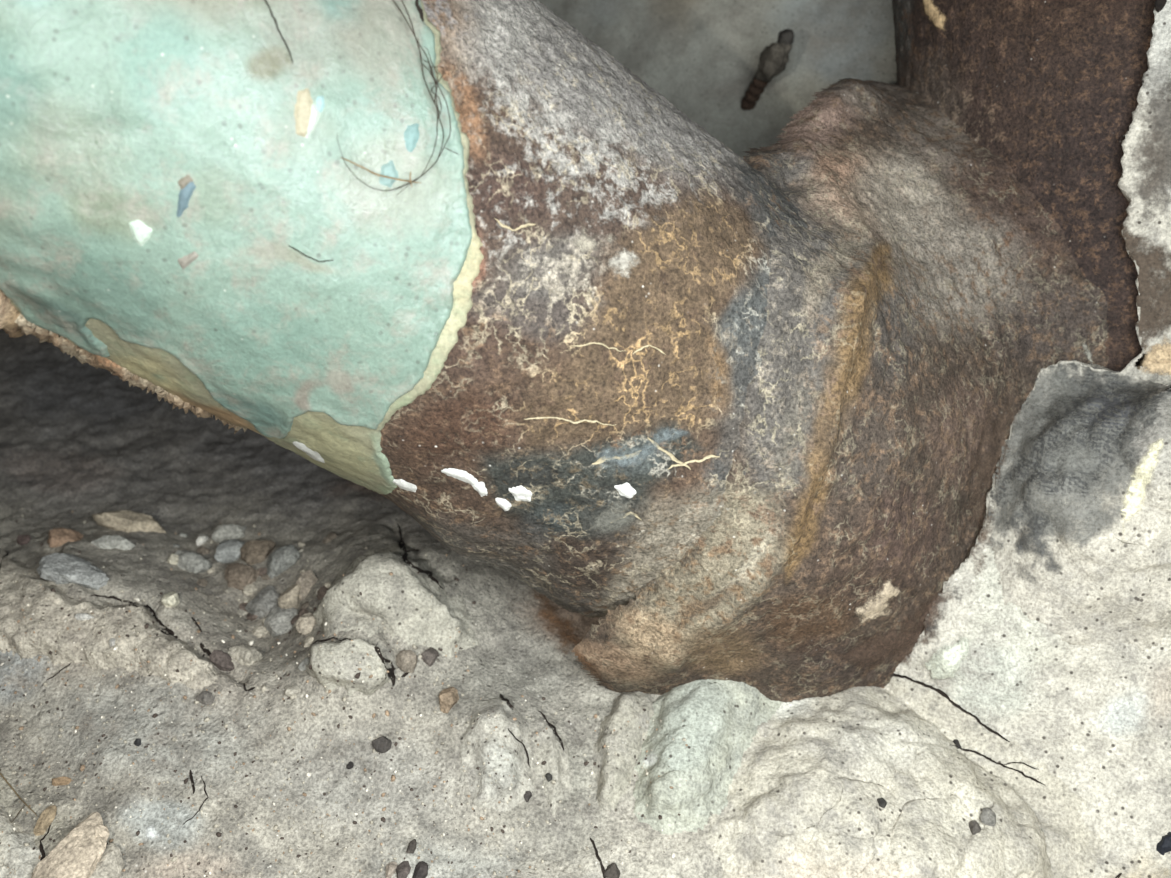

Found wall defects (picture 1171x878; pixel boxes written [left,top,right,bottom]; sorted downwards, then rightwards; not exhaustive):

damp [1132,83,1171,217]
peeling [129,220,153,246]
rust [1123,227,1171,349]
peeling [393,479,417,492]
peeling [441,468,532,511]
rust [971,396,1015,565]
efflorescence [1122,440,1163,520]
damp [1011,501,1060,571]
crack [91,594,211,656]
crack [312,637,408,687]
rust [803,591,951,671]
crack [893,673,1045,785]